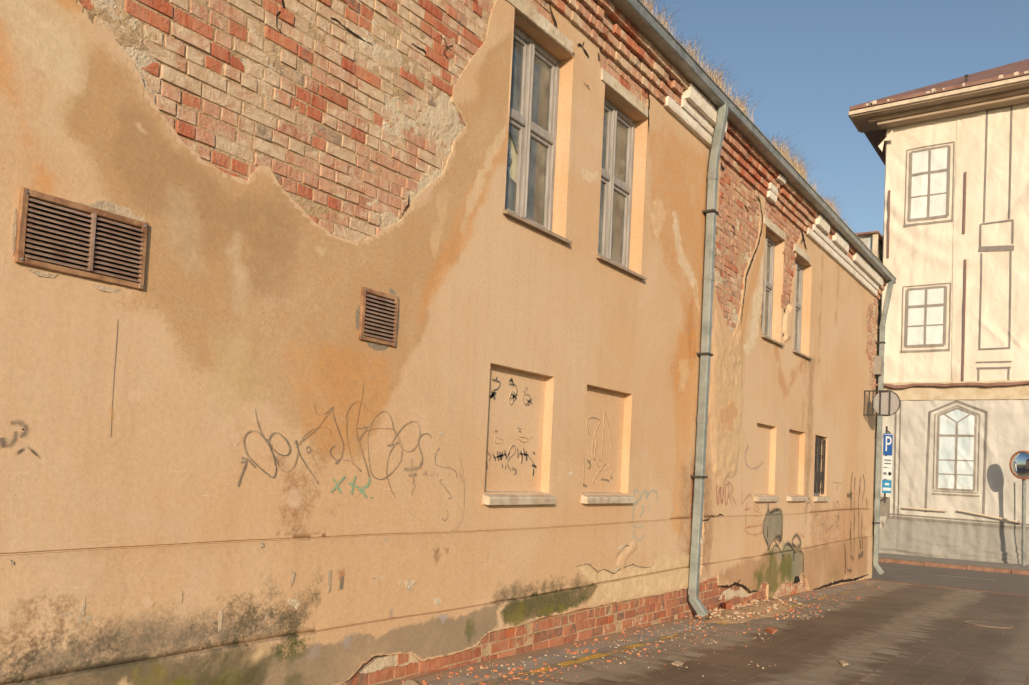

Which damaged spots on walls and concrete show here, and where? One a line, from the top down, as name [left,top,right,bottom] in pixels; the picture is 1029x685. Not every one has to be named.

crack [276,0,285,36]
spalling [515,0,555,31]
spalling [79,0,496,241]
spalling [27,268,58,278]
water stain [0,0,512,541]
crack [732,193,763,322]
spalling [714,159,801,336]
water stain [772,248,872,589]
spalling [689,465,703,532]
water stain [0,552,325,685]
water stain [488,568,592,610]
spalling [258,534,868,685]